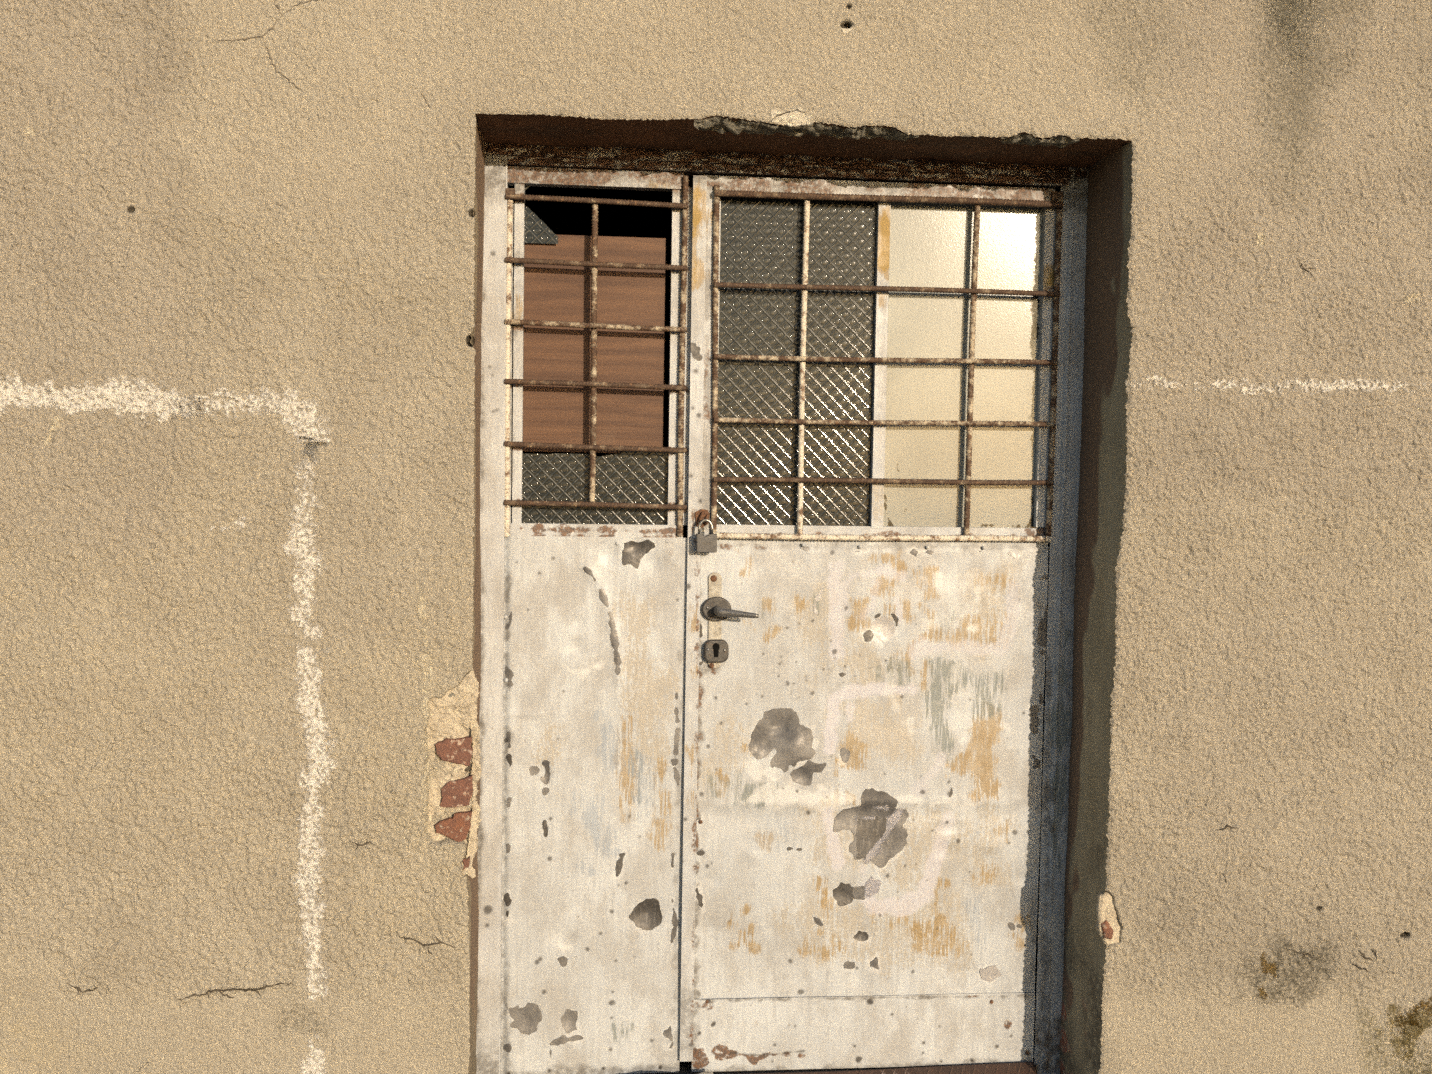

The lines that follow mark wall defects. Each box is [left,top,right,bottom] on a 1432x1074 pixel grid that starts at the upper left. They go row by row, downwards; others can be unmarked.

spalling [427,670,482,879]